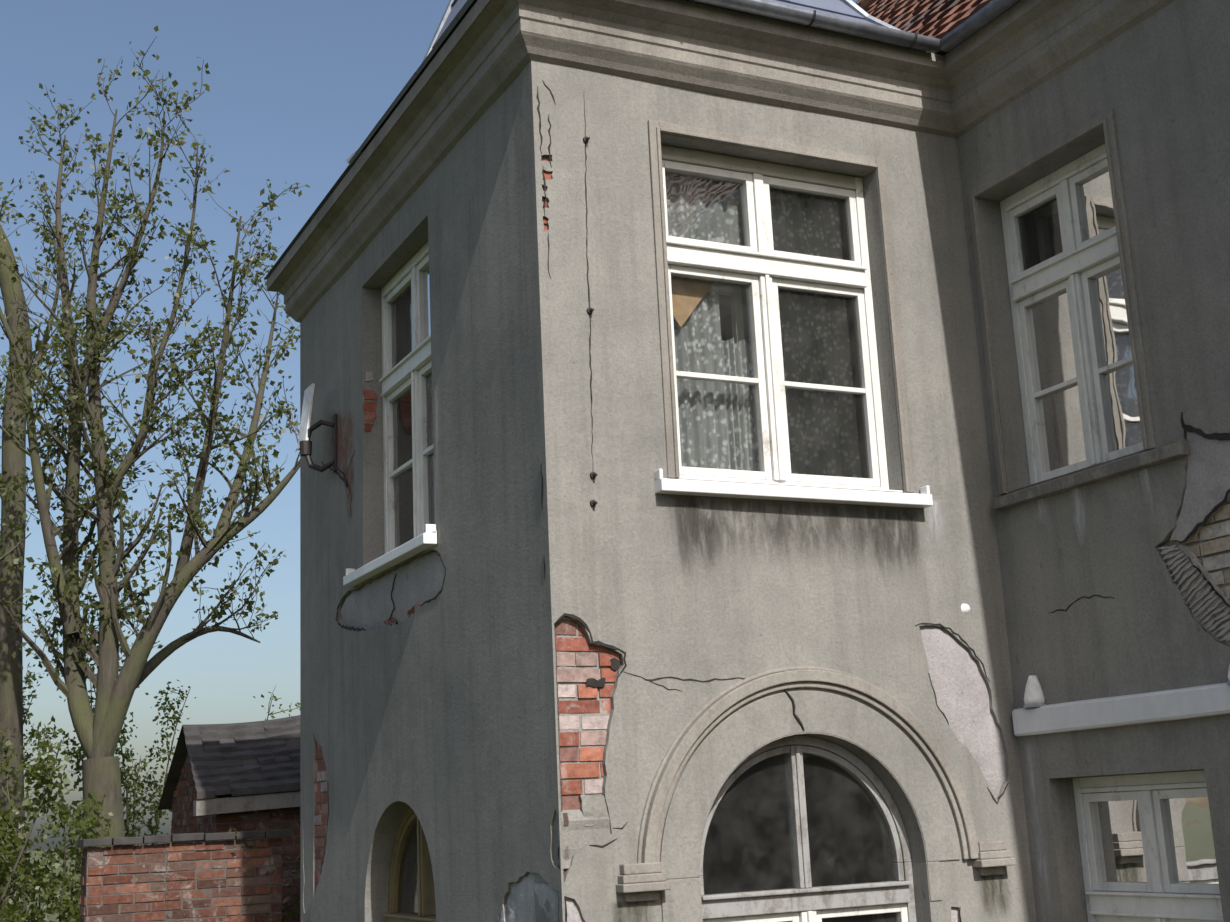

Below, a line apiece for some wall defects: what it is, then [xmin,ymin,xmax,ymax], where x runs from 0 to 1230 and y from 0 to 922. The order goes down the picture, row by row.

crack [536,80,593,458]
spalling [336,550,446,631]
crack [1048,595,1113,613]
spalling [1158,412,1230,646]
spalling [554,613,627,848]
crack [625,672,745,692]
crack [784,689,804,731]
spalling [915,623,1008,804]
spalling [314,741,329,891]
peeling [498,872,583,922]